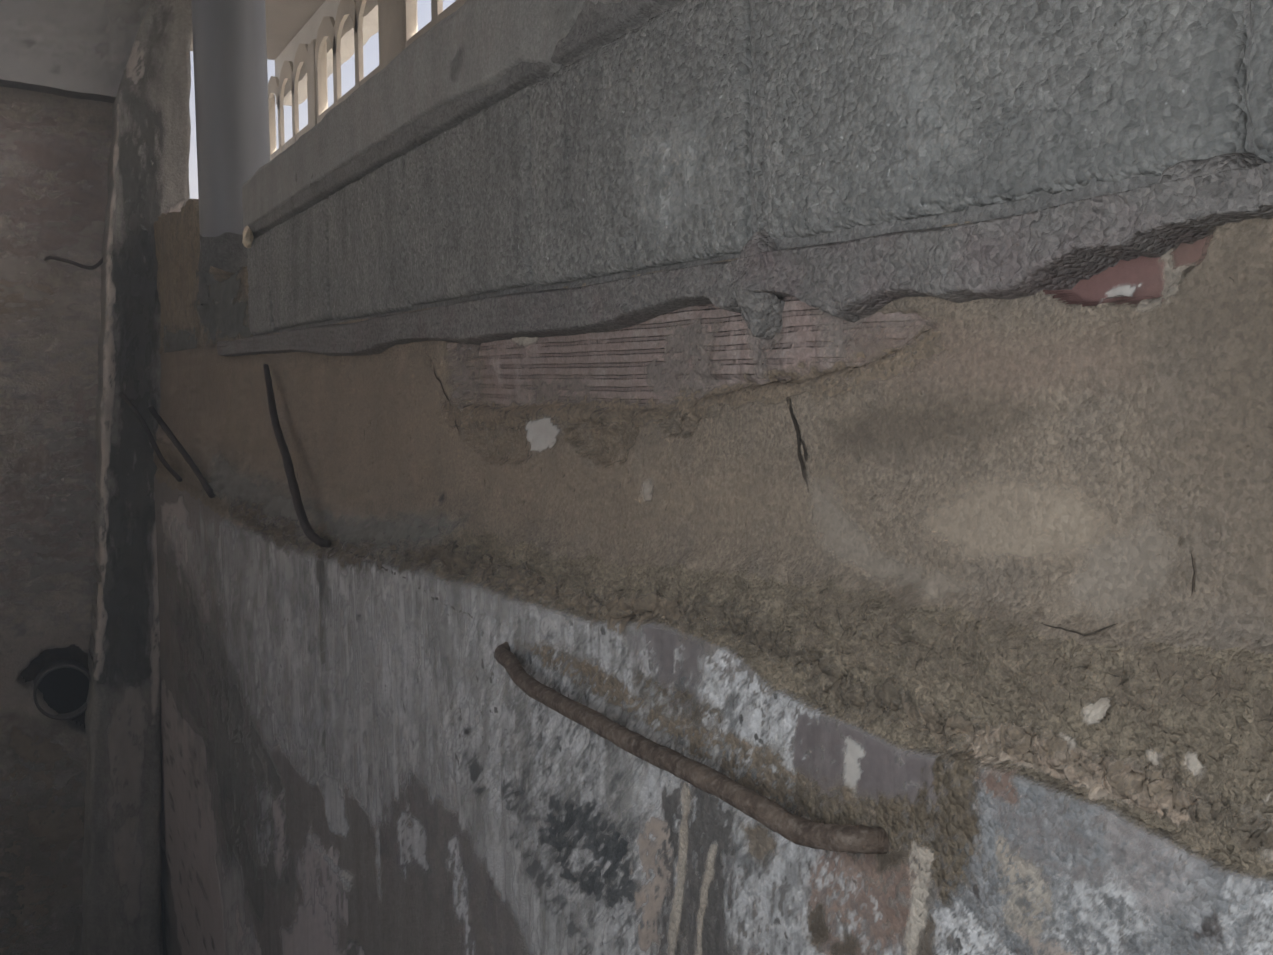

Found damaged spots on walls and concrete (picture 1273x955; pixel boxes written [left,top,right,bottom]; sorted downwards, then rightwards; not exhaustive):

spalling [1043,235,1213,312]
spalling [446,296,938,451]
crack [786,380,809,492]
leakage [208,455,1273,851]
leakage [169,548,289,921]
leakage [502,700,773,955]
rust [517,644,981,955]
leakage [905,841,967,955]
leakage [952,836,1144,955]